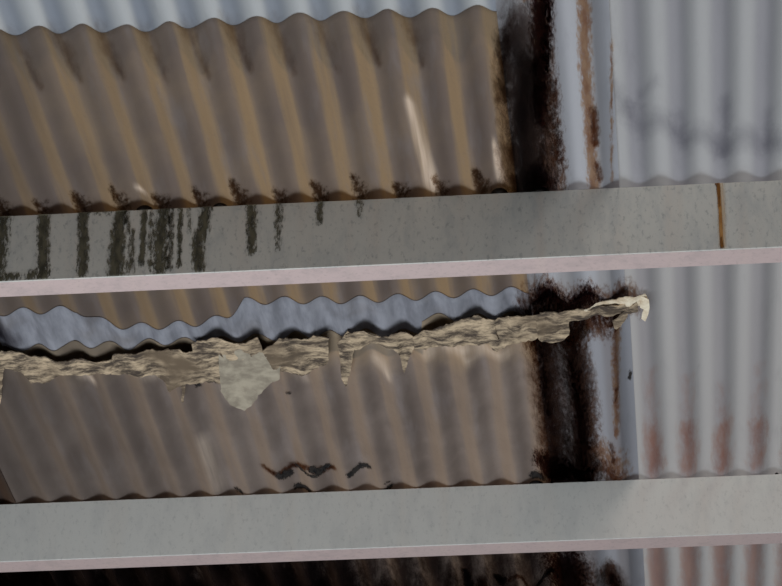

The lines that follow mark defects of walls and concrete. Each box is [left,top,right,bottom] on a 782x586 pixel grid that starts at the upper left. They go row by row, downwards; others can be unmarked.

rust [498,0,566,193]
rust [586,108,599,150]
damp [0,200,51,281]
damp [71,186,214,278]
damp [229,179,258,256]
damp [273,189,287,251]
damp [310,180,329,224]
damp [432,176,449,196]
damp [472,169,489,194]
rust [715,183,725,248]
rust [0,278,650,483]
rust [541,551,625,586]